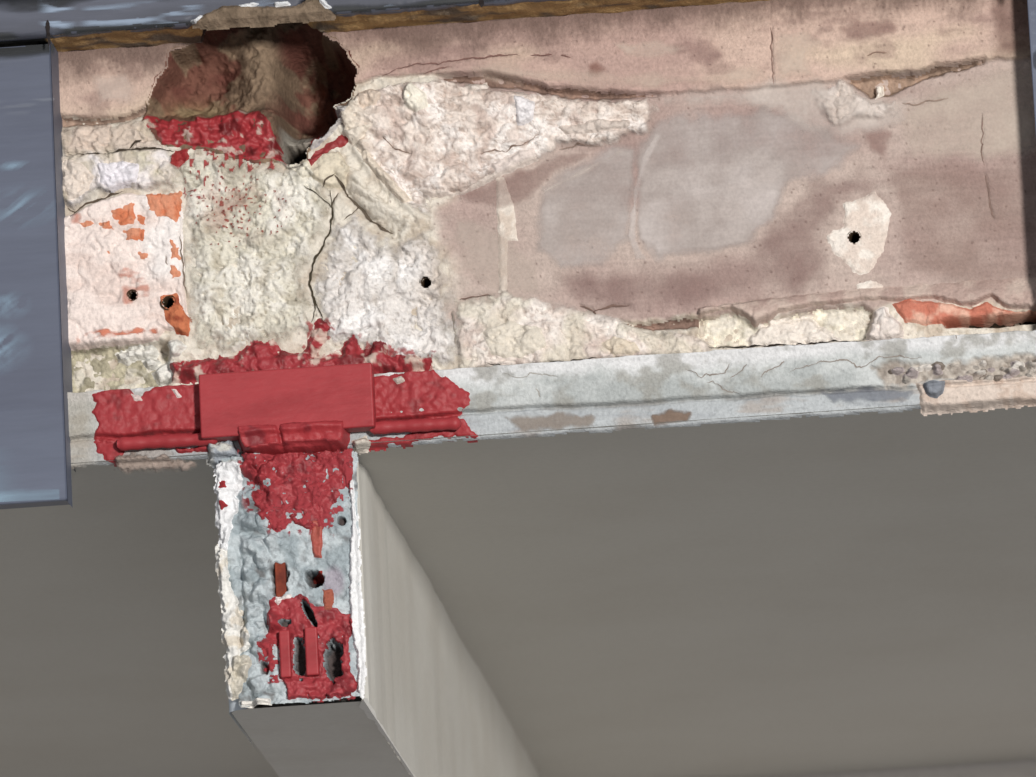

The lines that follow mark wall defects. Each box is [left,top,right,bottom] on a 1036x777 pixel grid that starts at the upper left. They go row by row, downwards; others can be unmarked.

peeling [46,7,70,27]
crack [384,54,571,75]
spalling [61,0,1036,368]
crack [981,113,995,219]
crack [305,174,393,322]
spalling [71,328,169,401]
spalling [213,451,416,777]